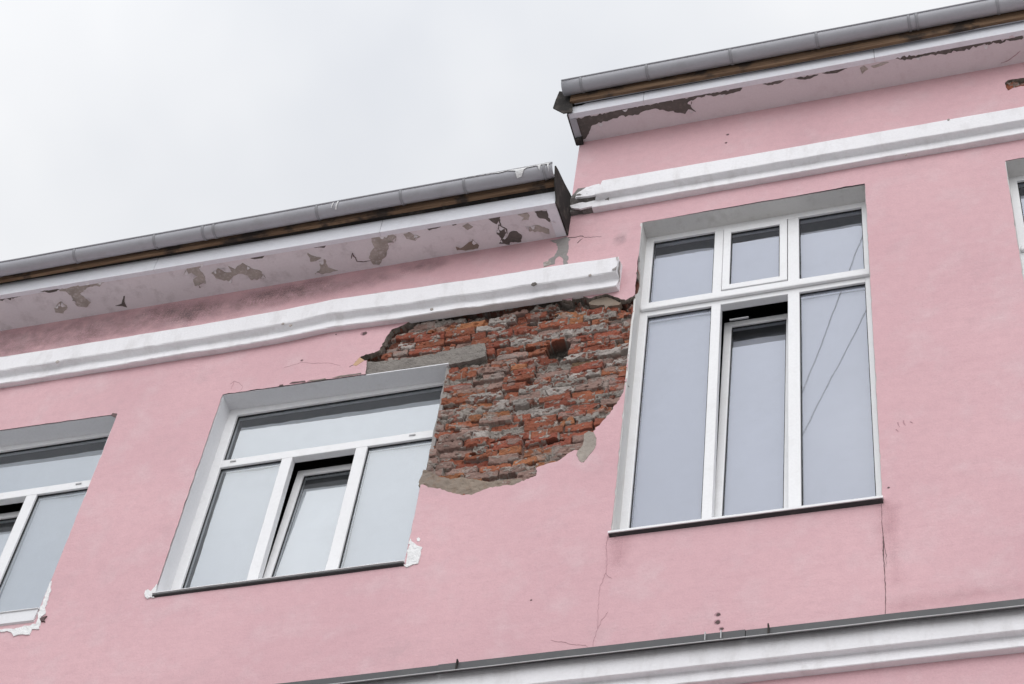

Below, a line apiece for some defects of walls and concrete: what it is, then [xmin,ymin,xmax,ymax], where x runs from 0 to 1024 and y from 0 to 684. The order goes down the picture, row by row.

peeling [860,36,1023,74]
peeling [764,68,847,85]
flaking render [1005,78,1024,90]
peeling [577,88,742,140]
peeling [184,256,266,288]
peeling [307,246,337,274]
peeling [369,227,439,265]
peeling [453,223,479,251]
flaking render [489,211,570,267]
peeling [41,281,104,313]
flaking render [279,270,640,485]
crack [880,503,888,614]